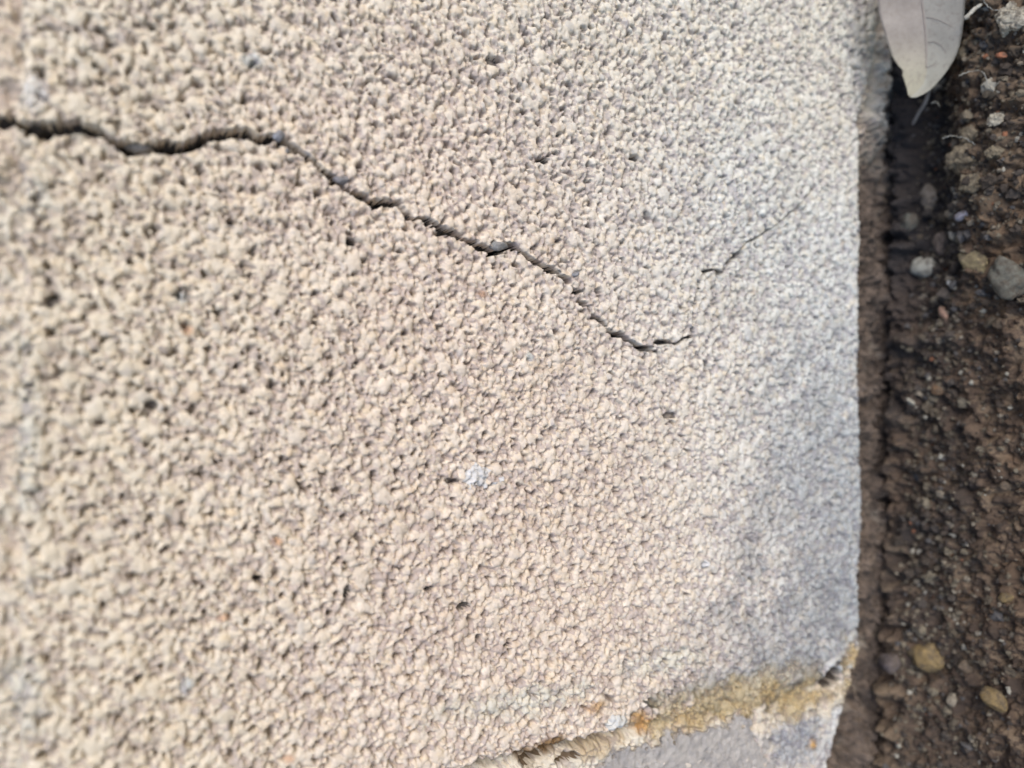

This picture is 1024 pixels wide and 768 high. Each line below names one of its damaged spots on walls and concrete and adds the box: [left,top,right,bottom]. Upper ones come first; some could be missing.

crack [0,117,764,367]